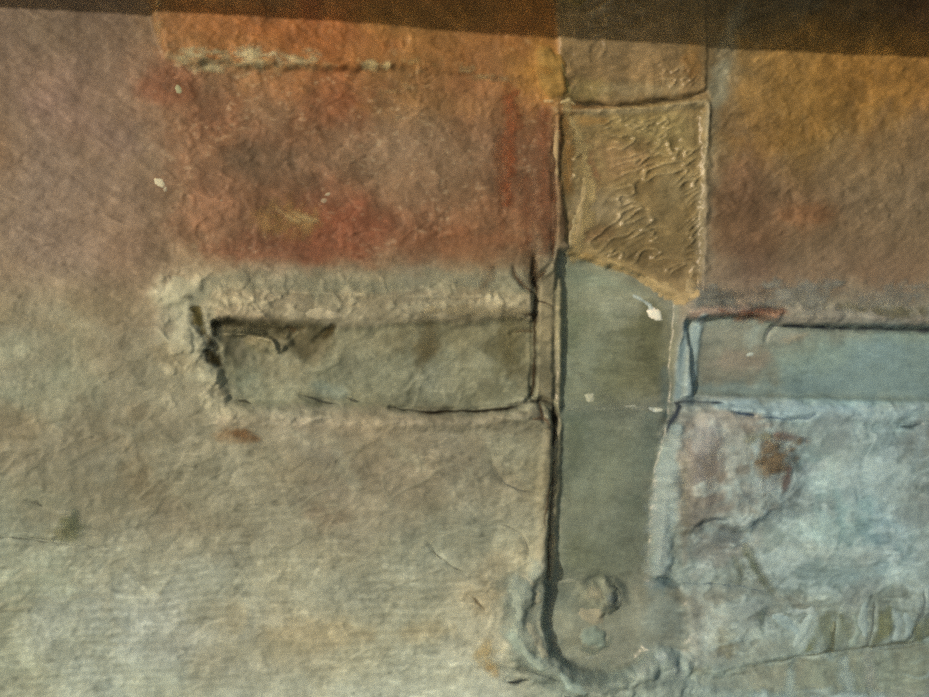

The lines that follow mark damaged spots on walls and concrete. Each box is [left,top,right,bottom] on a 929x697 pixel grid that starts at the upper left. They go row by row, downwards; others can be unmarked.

spalling [191,306,263,366]
crack [393,134,557,573]
rust [749,433,801,489]